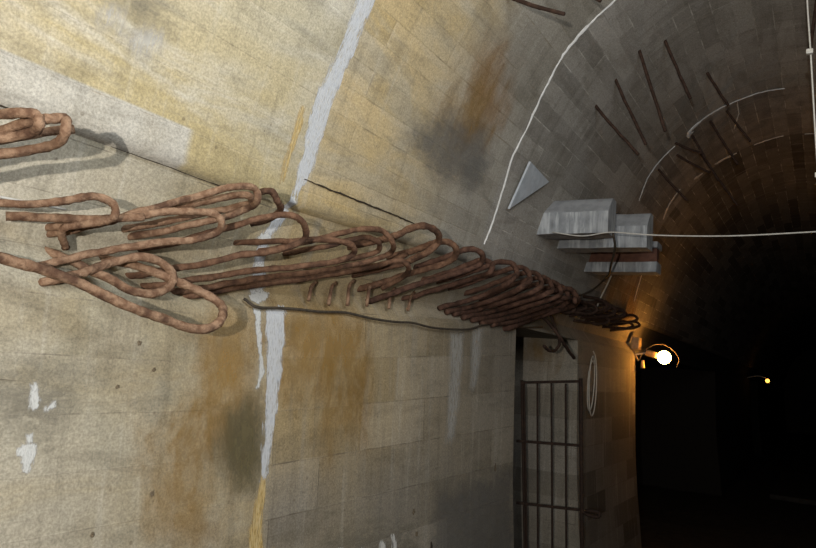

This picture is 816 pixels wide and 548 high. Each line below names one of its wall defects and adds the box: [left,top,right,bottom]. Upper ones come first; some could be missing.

damp [253,0,375,276]
damp [226,287,286,548]